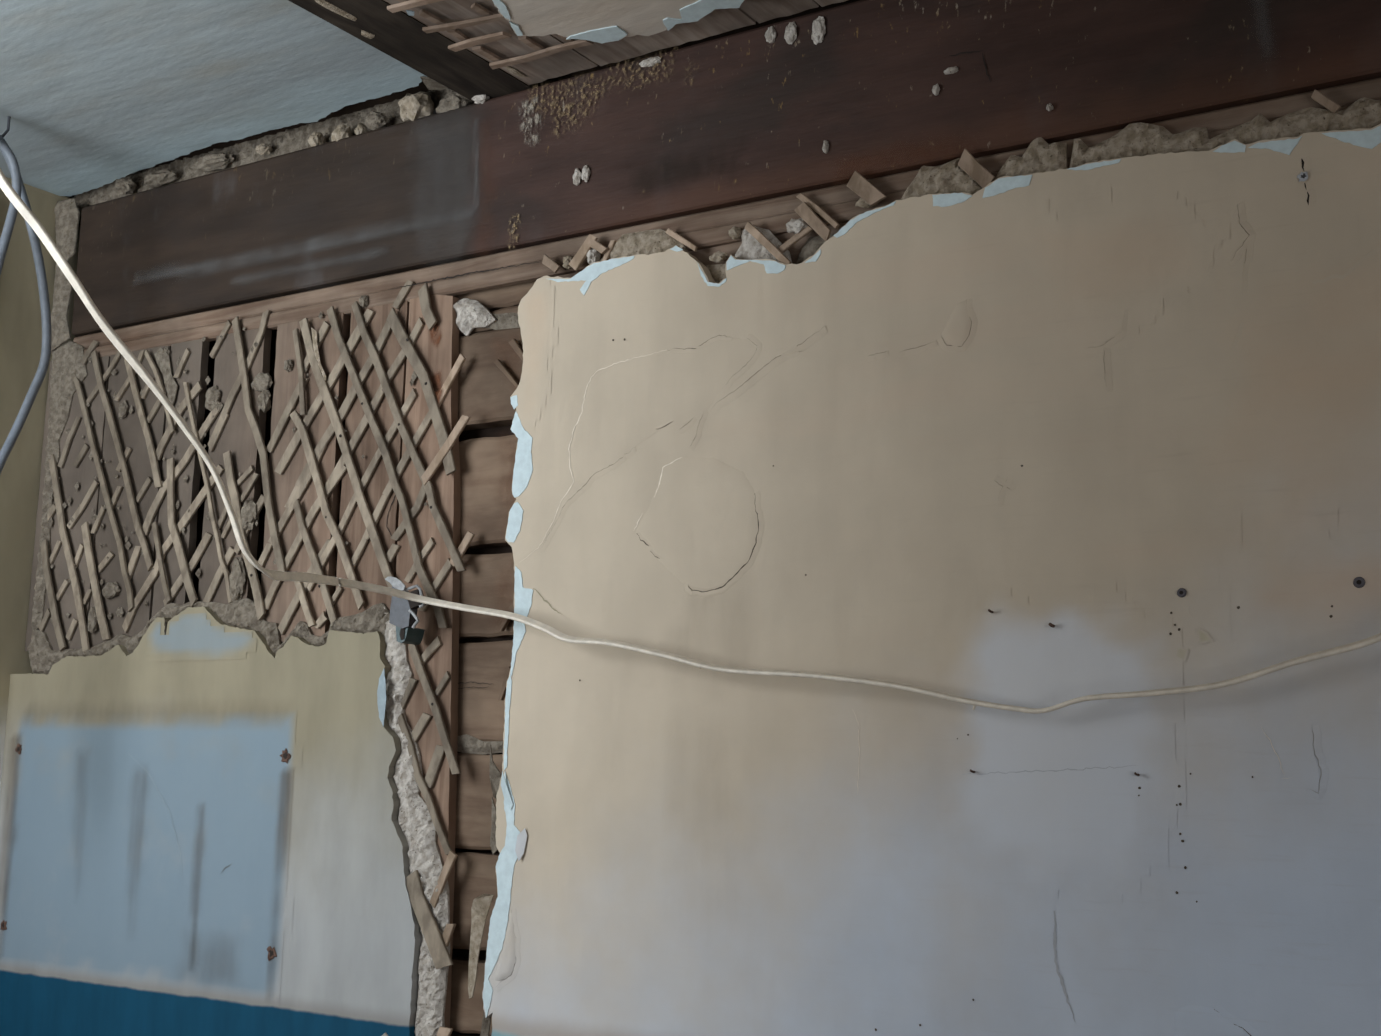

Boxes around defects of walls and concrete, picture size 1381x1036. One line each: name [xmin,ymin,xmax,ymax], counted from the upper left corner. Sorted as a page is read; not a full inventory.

flaking render [426,88,474,114]
peeling [492,0,523,36]
peeling [566,25,627,44]
corrosion [531,53,673,134]
flaking render [639,56,661,67]
peeling [663,0,744,31]
flaking render [765,16,826,45]
flaking render [546,97,1381,295]
flaking render [27,99,450,1036]
crack [684,491,764,598]
peeling [468,566,533,1036]
crack [1053,911,1075,1021]